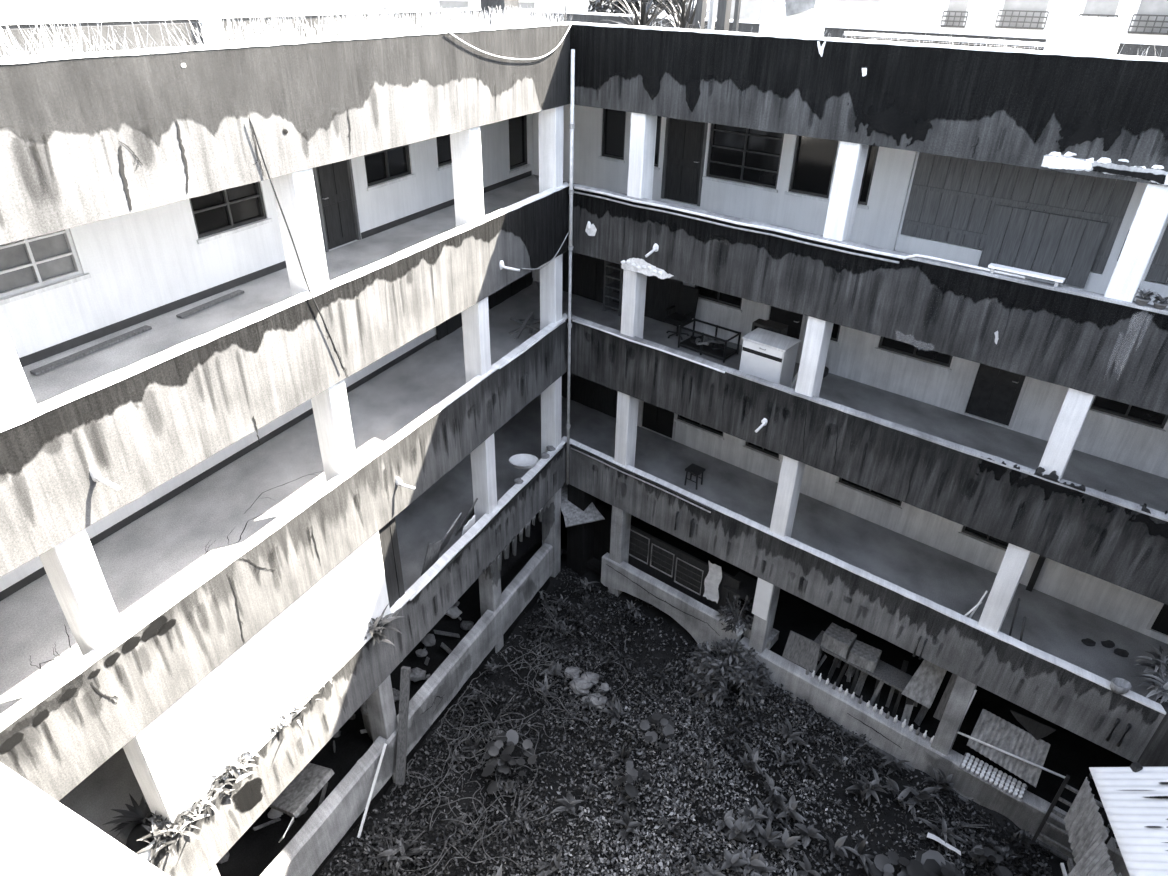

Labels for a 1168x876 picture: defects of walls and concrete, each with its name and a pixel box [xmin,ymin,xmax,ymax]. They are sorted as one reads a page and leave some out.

crack [119,141,143,210]
crack [176,120,189,193]
water stain [0,25,1168,153]
water stain [0,186,1168,475]
crack [191,471,322,644]
water stain [485,443,566,530]
water stain [589,454,1168,724]
water stain [189,621,392,833]